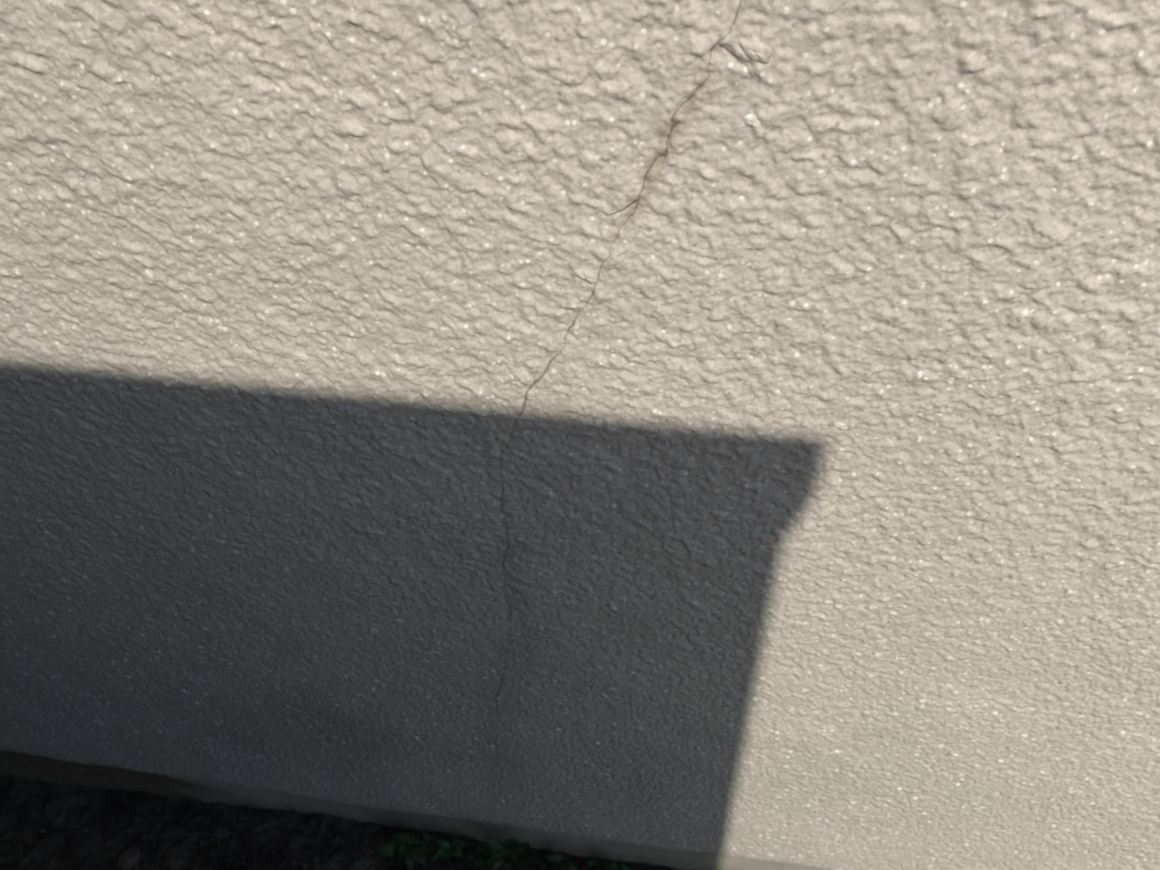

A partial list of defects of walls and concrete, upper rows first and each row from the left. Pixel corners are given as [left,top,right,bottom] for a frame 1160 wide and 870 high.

crack [713,7,751,74]
crack [601,176,646,234]